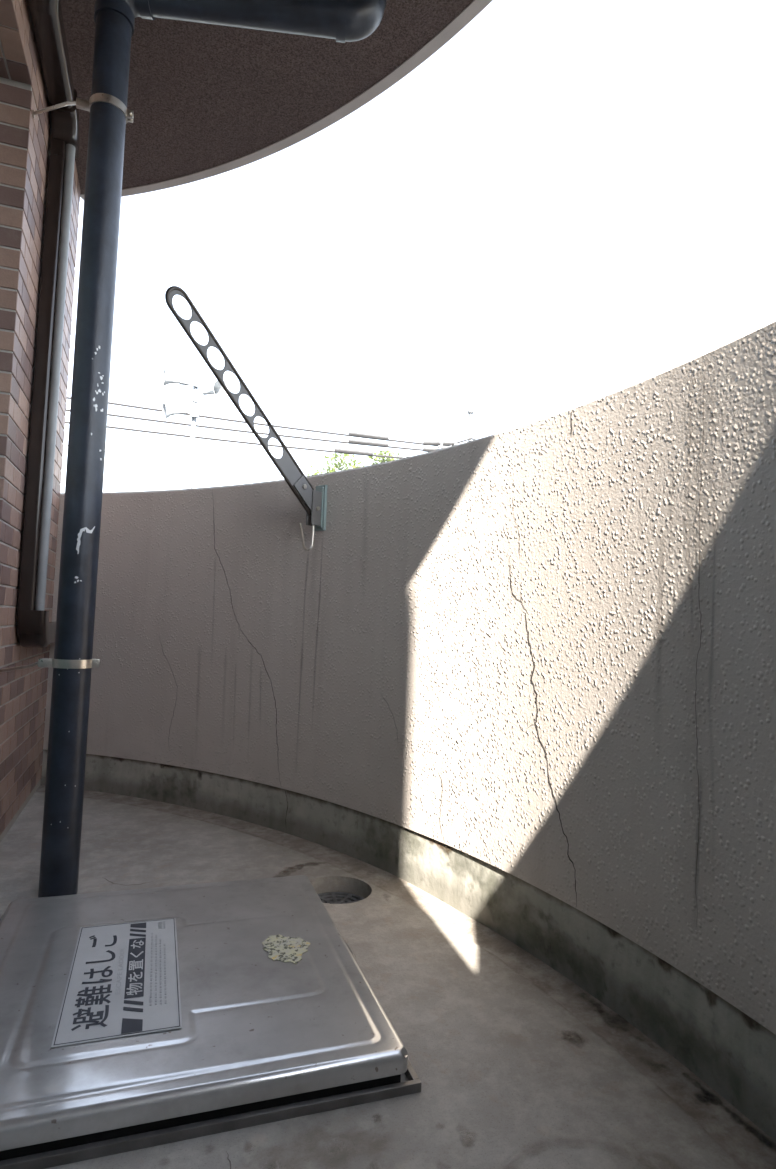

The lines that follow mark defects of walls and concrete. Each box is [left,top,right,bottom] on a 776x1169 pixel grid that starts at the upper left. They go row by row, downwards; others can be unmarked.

crack [509,505,577,906]